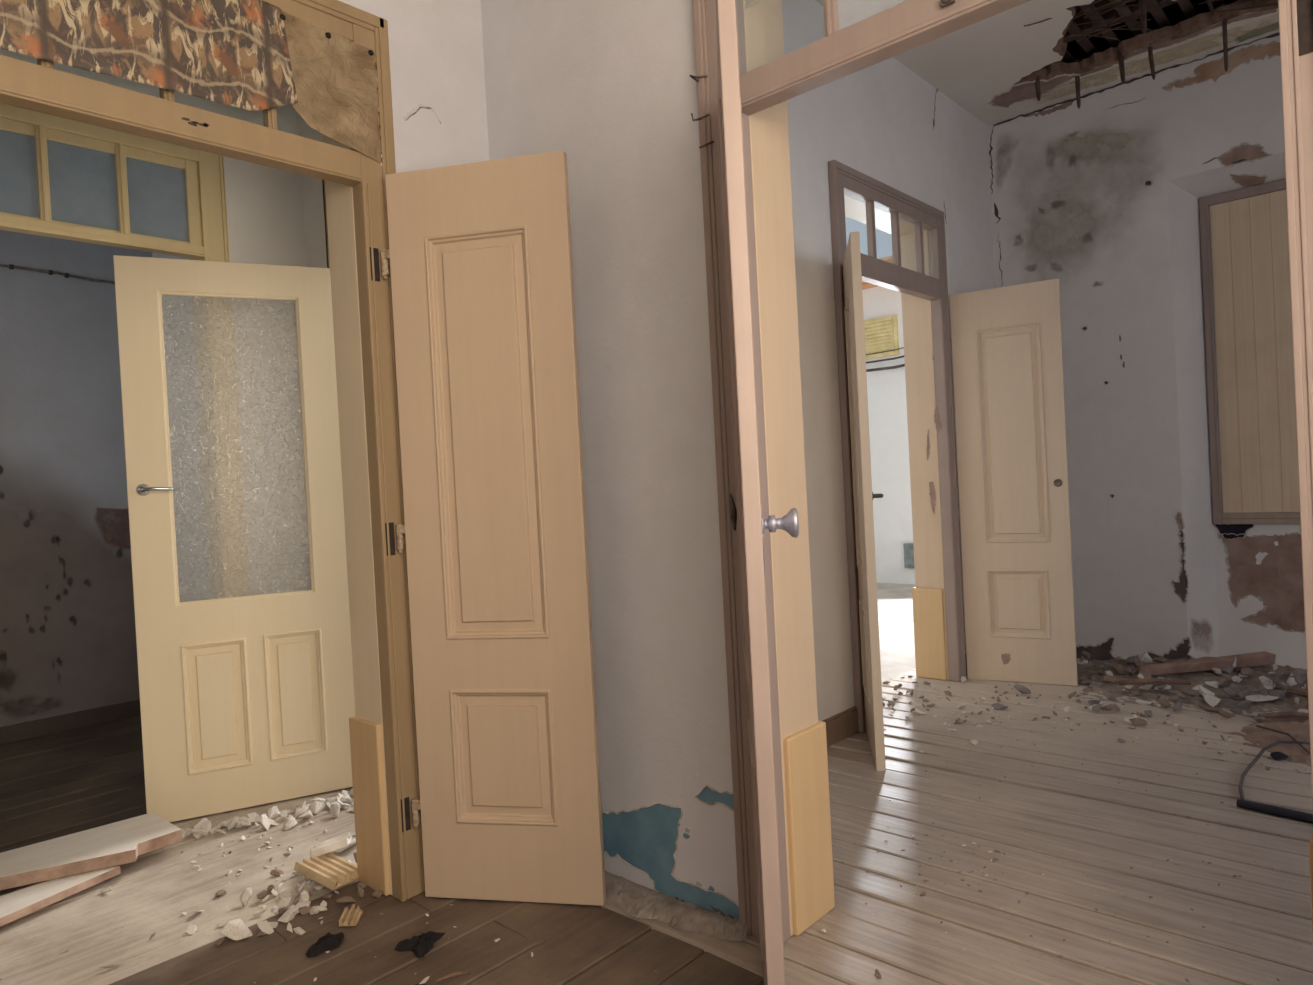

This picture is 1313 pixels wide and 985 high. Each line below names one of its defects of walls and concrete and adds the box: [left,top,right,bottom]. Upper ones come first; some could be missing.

spalling [988,0,1280,117]
crack [989,33,1280,287]
flaking render [1203,142,1273,187]
water stain [0,489,140,727]
peeling [96,508,131,548]
flaking render [1076,636,1121,660]
flaking render [1147,636,1194,659]
flaking render [1171,511,1189,603]
flaking render [1213,524,1305,633]
peeling [695,785,734,811]
peeling [602,802,752,941]